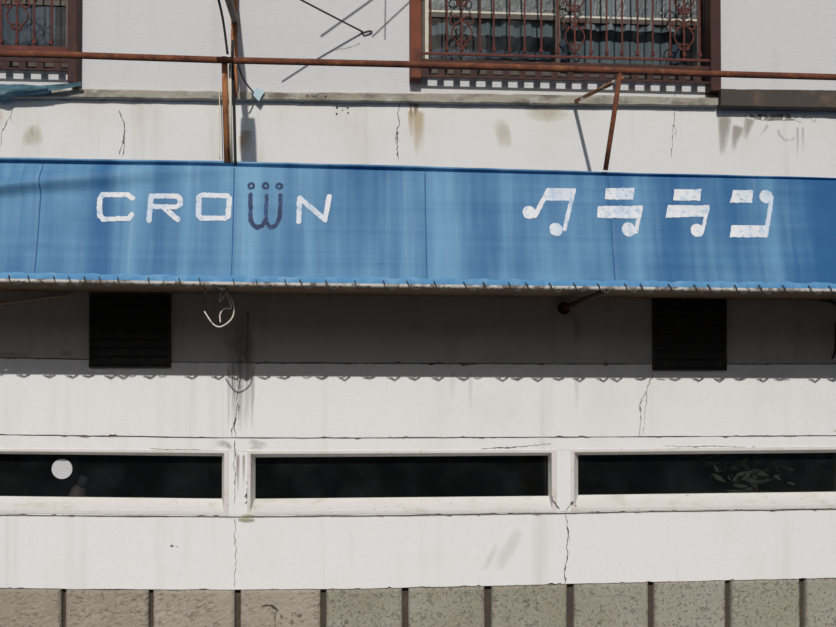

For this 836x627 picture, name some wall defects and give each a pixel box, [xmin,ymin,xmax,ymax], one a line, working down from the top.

crack [393,104,401,161]
crack [639,374,654,435]
crack [231,310,249,587]
crack [552,498,574,584]